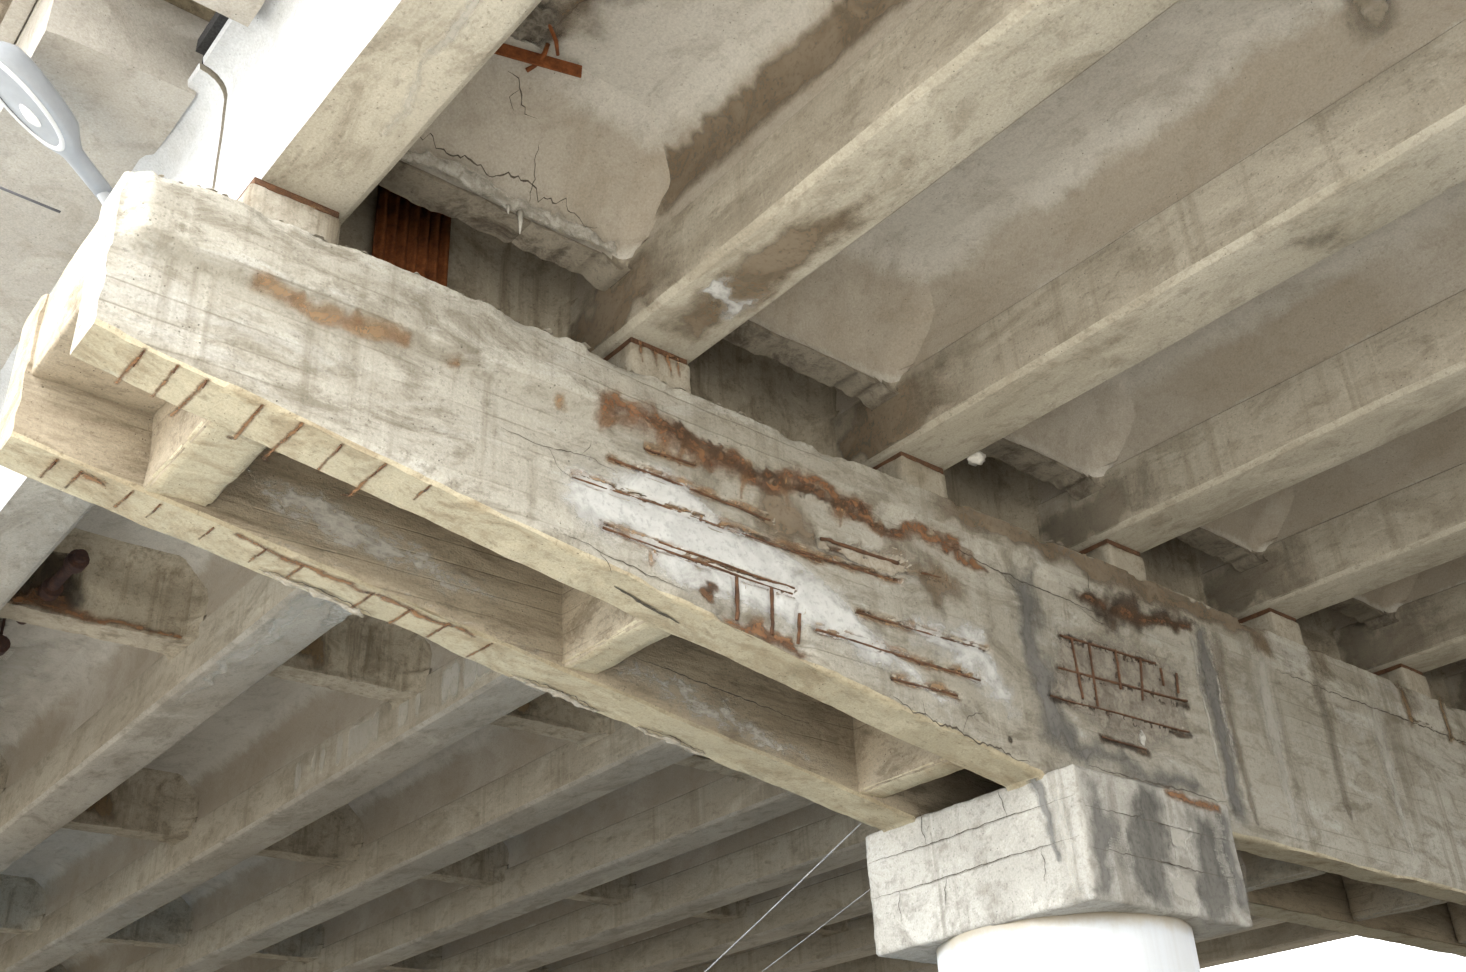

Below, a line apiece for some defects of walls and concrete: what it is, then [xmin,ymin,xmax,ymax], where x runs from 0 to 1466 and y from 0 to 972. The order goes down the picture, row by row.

spalling [510,0,561,46]
crack [552,0,591,34]
corrosion [372,185,451,287]
leakage [674,211,854,339]
corrosion [169,378,210,417]
spalling [572,444,947,583]
corrosion [599,391,988,573]
leakage [0,551,183,639]
corrosion [234,533,492,657]
spalling [601,522,987,700]
leakage [939,496,1268,922]
spalling [1048,633,1192,756]